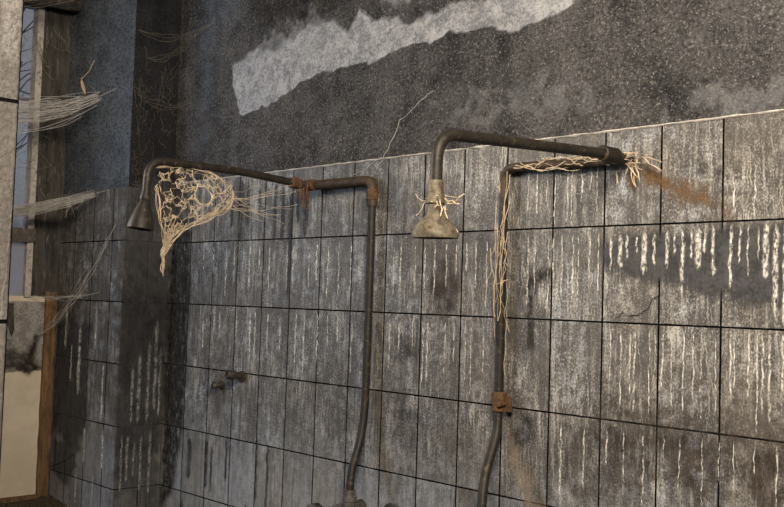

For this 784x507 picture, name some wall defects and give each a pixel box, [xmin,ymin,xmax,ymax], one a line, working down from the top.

peeling [232,0,573,116]
rust [629,169,710,204]
water stain [249,185,308,296]
water stain [526,176,784,347]
peeling [5,301,45,372]
water stain [52,304,97,502]
water stain [115,180,191,503]
water stain [610,333,636,418]
water stain [648,331,672,422]
water stain [682,333,702,411]
water stain [747,334,771,424]
water stain [603,421,720,502]